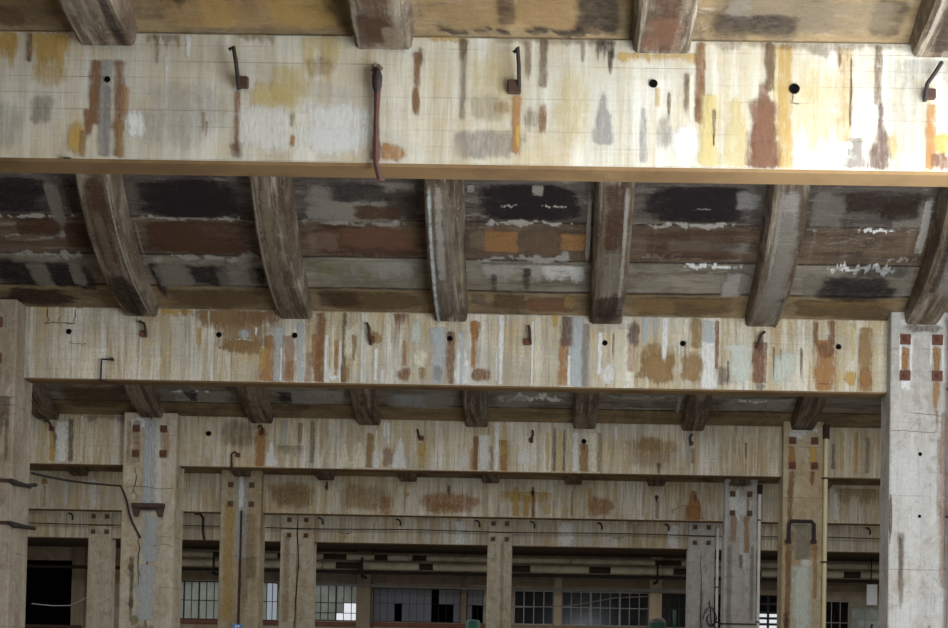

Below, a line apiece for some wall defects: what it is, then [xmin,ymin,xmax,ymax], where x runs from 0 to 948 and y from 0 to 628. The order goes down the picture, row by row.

rust [526,39,548,86]
rust [68,60,101,157]
rust [113,60,129,157]
rust [512,96,547,154]
rust [747,43,779,168]
rust [926,105,948,170]
rust [686,491,703,520]